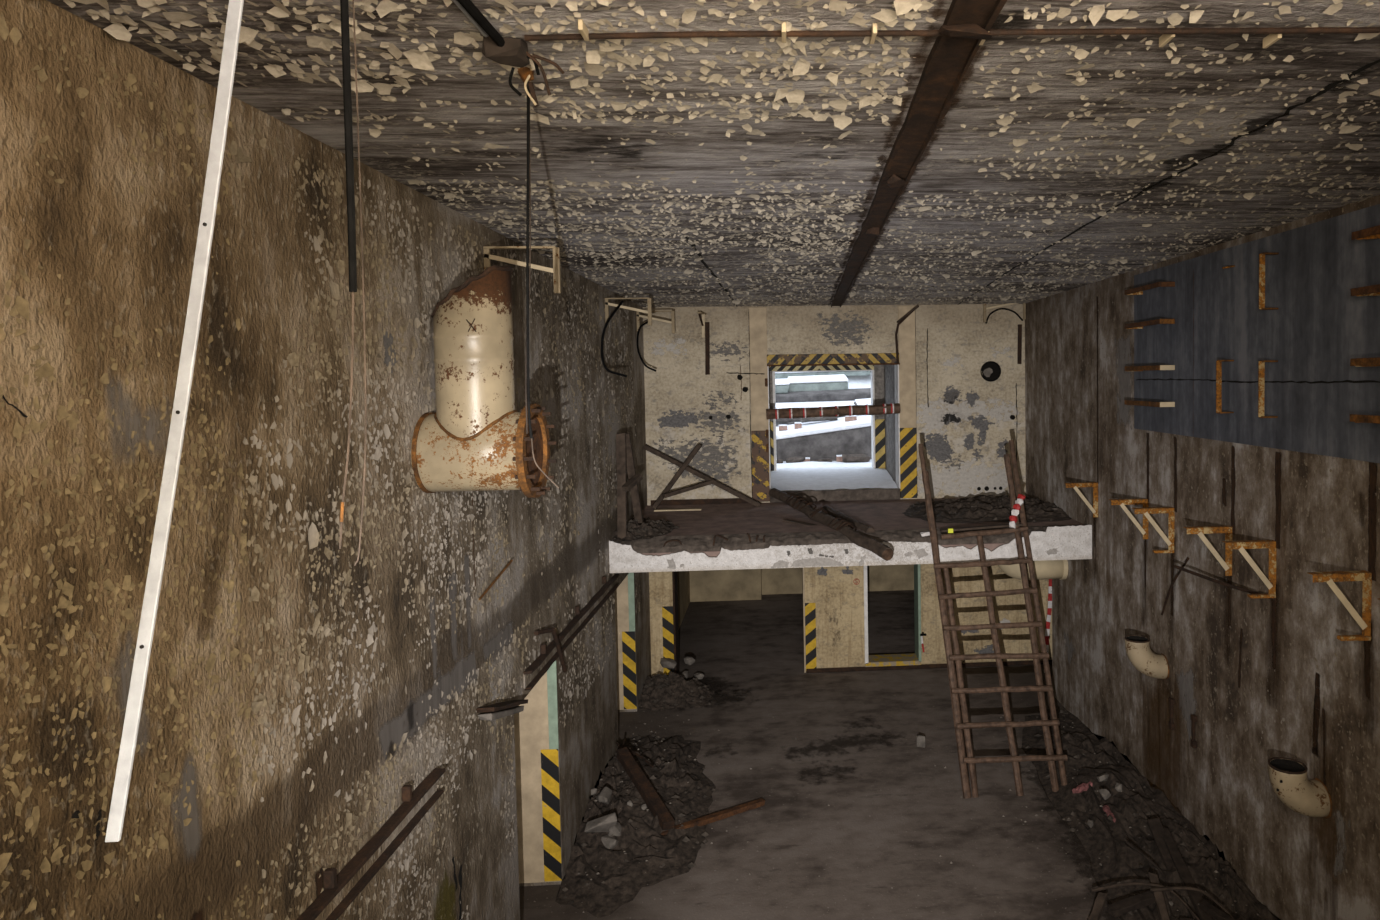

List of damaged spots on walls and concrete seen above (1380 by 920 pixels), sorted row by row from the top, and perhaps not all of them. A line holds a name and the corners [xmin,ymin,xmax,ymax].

peeling [59,0,228,75]
peeling [972,0,1205,101]
peeling [1263,0,1321,59]
peeling [281,99,502,168]
crack [957,59,1380,305]
peeling [653,391,745,487]
peeling [916,384,1036,498]
spalling [598,507,1084,581]
corrosion [1368,462,1377,581]
corrosion [1268,583,1279,700]
corrosion [1364,623,1373,730]
peeling [224,566,615,920]